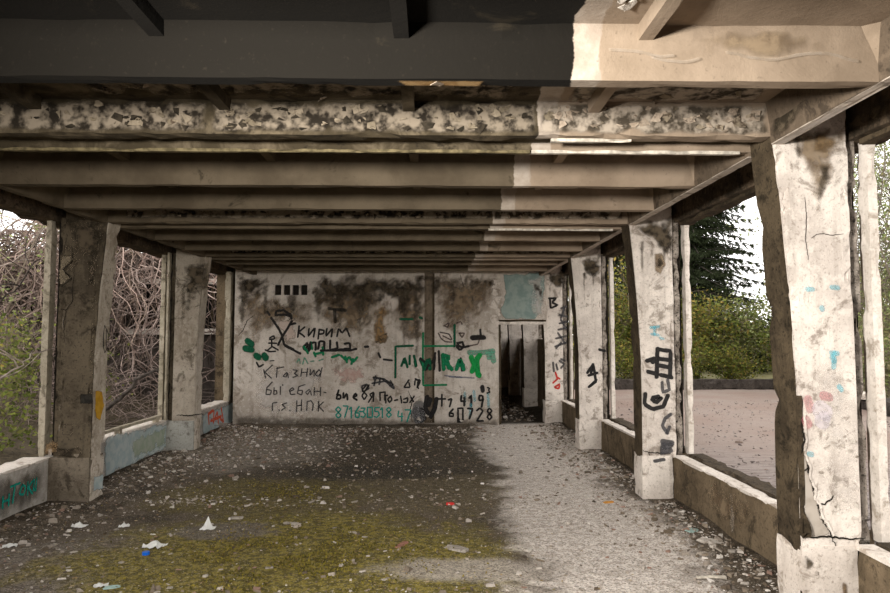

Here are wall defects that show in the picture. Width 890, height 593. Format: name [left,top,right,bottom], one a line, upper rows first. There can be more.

damp [794,131,841,192]
damp [640,217,675,254]
damp [240,275,492,339]
crack [800,417,865,546]